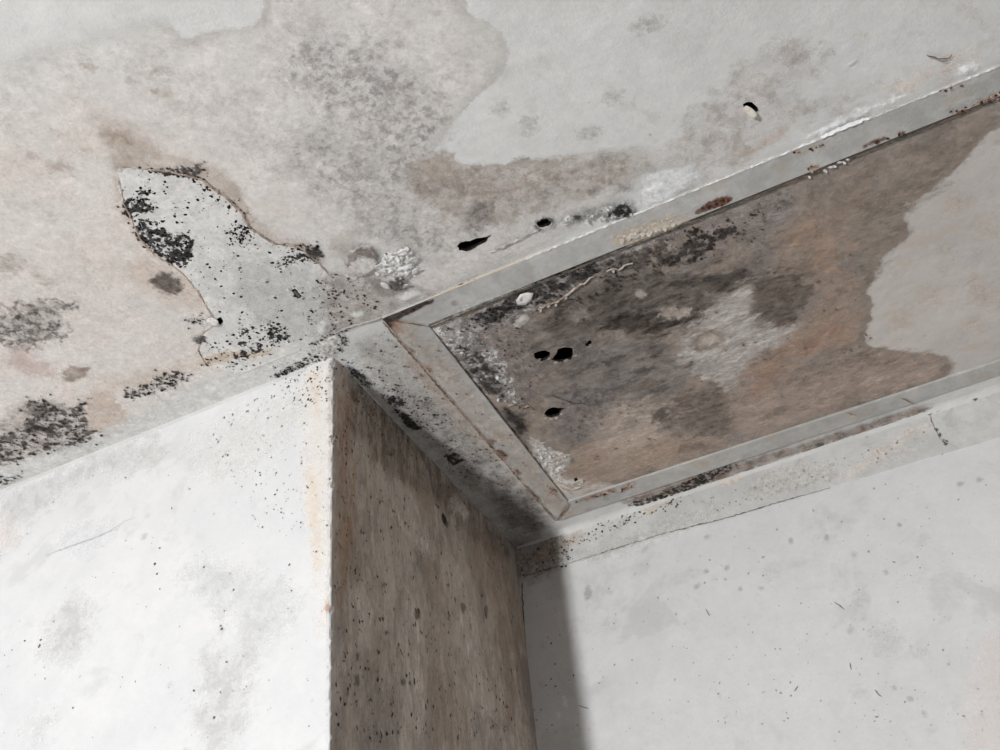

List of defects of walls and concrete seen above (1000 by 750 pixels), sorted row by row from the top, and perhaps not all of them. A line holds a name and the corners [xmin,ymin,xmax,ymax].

peeling [118,166,351,374]
damp [0,0,638,286]
hole [459,237,487,249]
rust [695,197,732,214]
damp [434,96,1000,487]
damp [0,156,932,750]